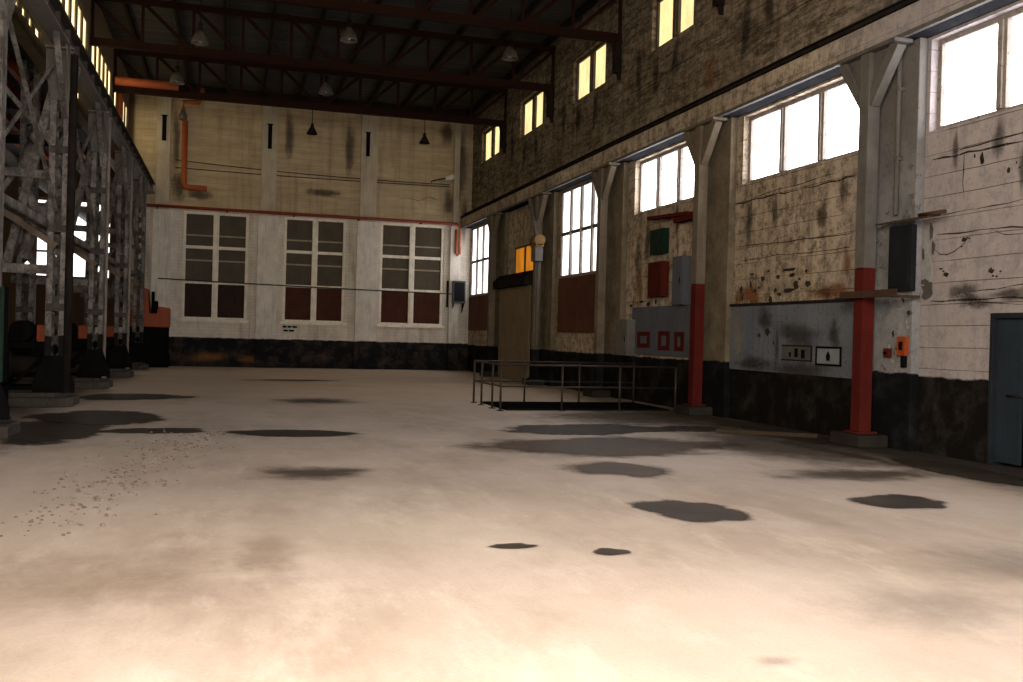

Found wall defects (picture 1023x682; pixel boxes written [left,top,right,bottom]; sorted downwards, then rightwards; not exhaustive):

water stain [954,286,985,307]
water stain [998,290,1019,299]
water stain [629,500,750,522]
water stain [847,494,946,508]